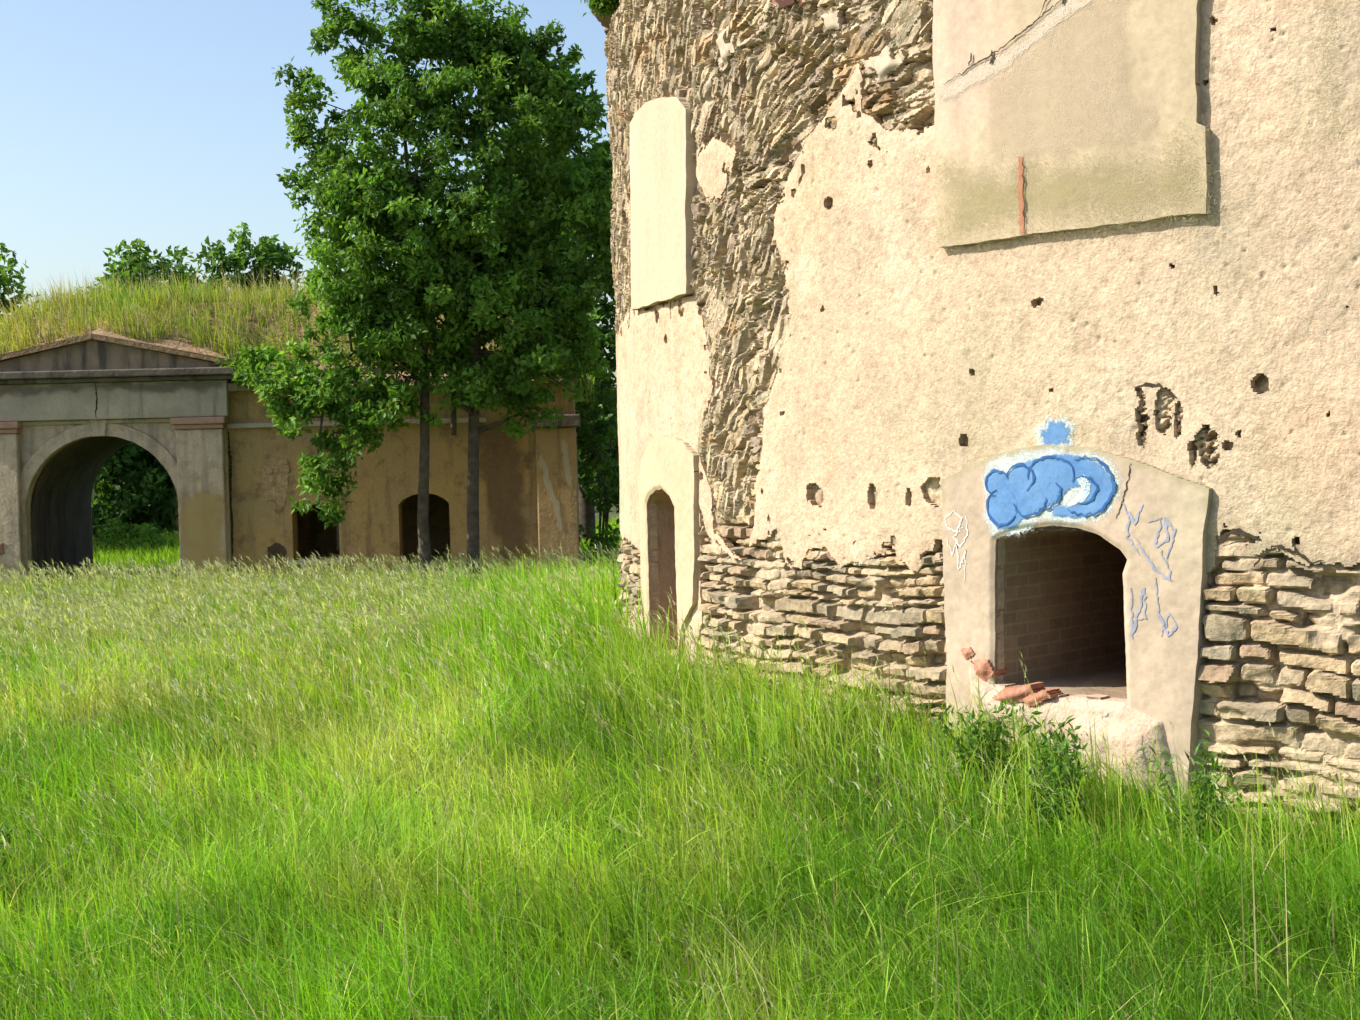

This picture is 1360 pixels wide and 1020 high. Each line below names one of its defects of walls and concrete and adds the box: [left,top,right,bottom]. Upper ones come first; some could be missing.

rust [1016,157,1026,234]
spalling [604,0,1094,727]
spalling [1255,373,1269,394]
spalling [1137,387,1228,469]
crack [1116,463,1131,518]
spalling [1196,525,1360,825]